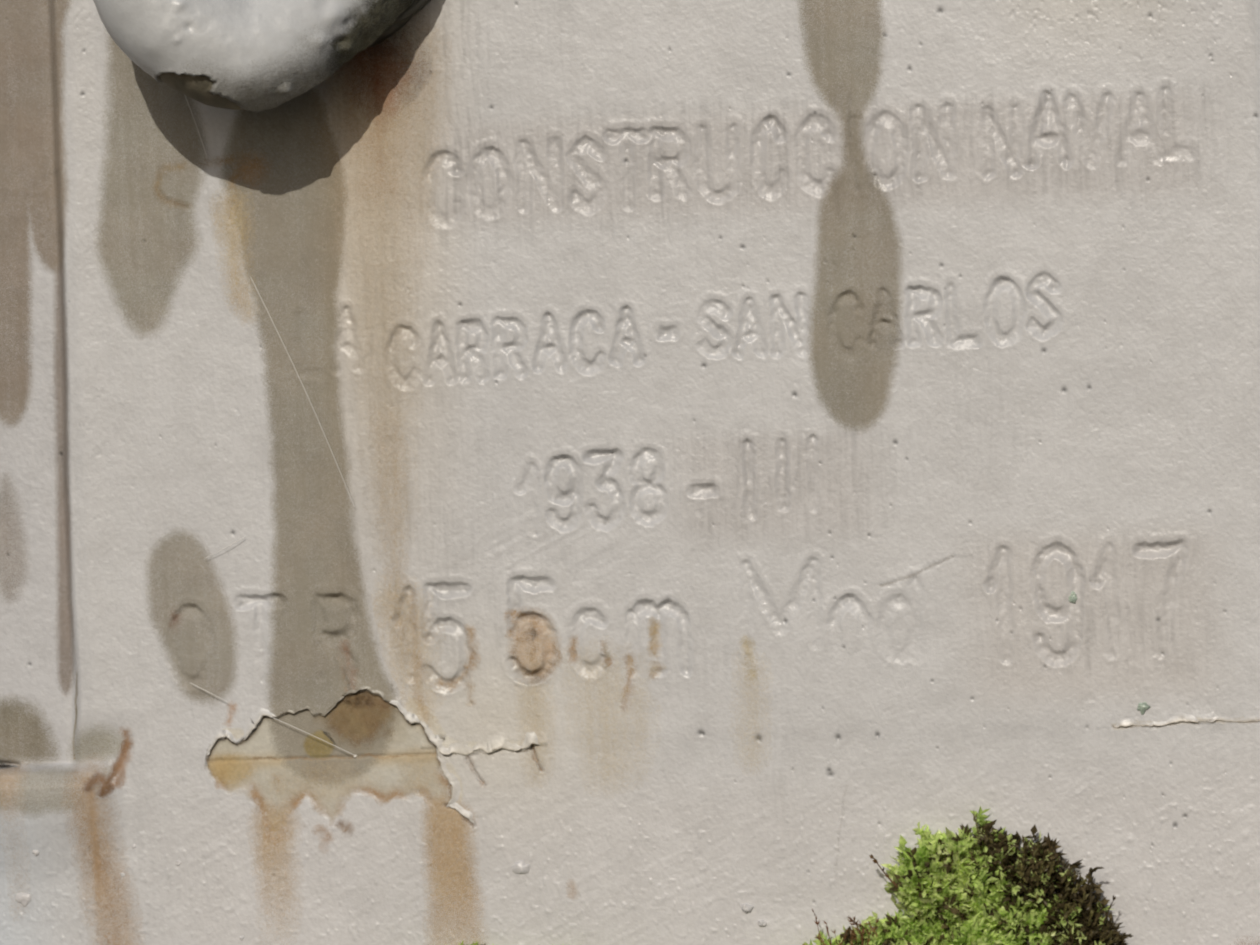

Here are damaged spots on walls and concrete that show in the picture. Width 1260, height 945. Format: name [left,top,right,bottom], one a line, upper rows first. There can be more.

water stain [797,0,906,436]
water stain [0,0,76,697]
water stain [93,27,403,792]
water stain [0,691,132,820]
peeling [205,686,544,852]
corrosion [504,606,579,789]
crack [1112,712,1260,730]